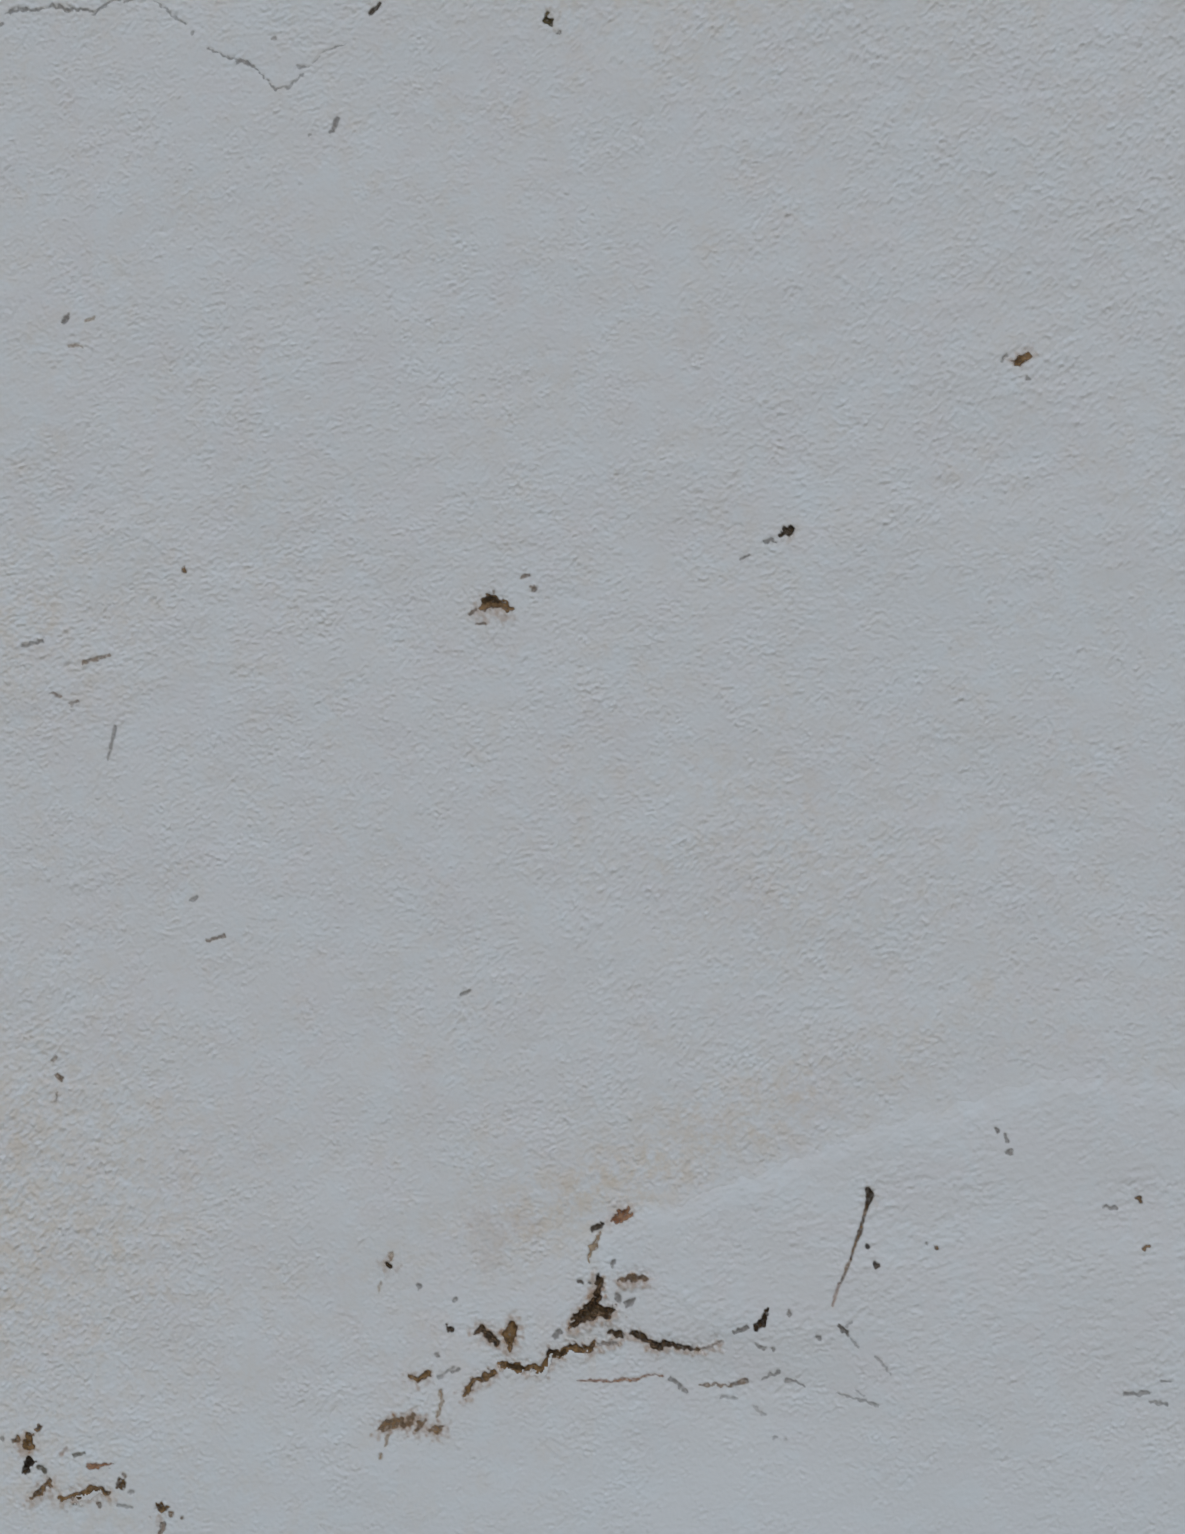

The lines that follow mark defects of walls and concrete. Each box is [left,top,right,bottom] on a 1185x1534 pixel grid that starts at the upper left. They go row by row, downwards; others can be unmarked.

spalling [469,591,514,625]
crack [733,1308,769,1334]
crack [463,1329,748,1397]
spalling [12,1424,47,1474]
spalling [156,1502,183,1519]